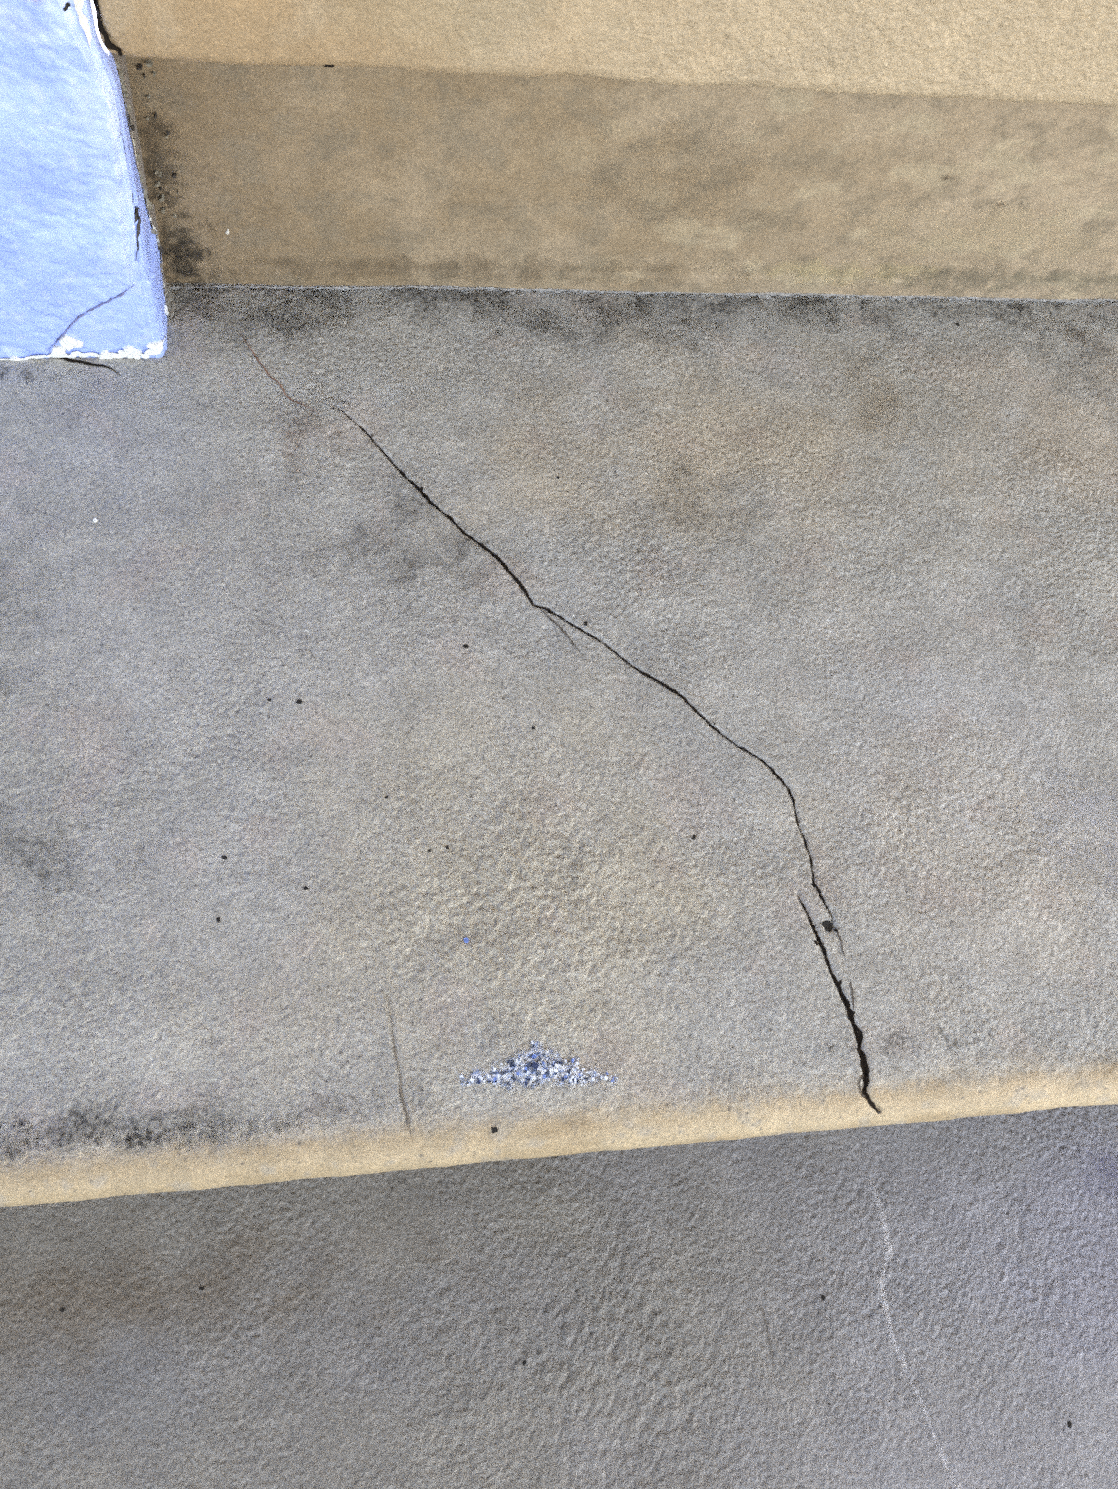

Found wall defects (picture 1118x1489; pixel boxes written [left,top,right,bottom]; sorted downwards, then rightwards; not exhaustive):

peeling [460,1041,618,1088]
crack [240,331,881,1135]